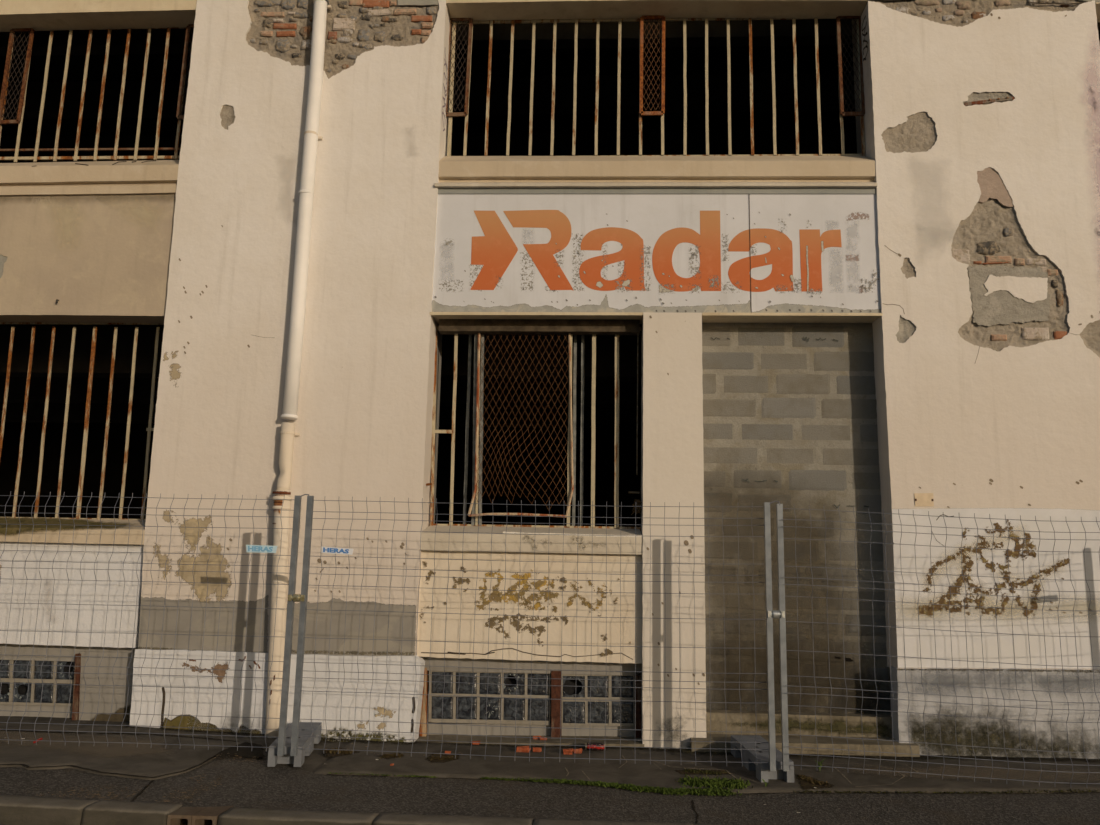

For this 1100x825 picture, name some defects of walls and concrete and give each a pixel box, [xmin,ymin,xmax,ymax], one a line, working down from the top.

spalling [246,0,314,66]
spalling [323,0,447,79]
spalling [220,105,235,130]
spalling [881,112,937,153]
spalling [963,92,1014,106]
spalling [951,167,1100,357]
spalling [896,316,916,343]
peeling [153,509,232,603]
peeling [453,566,618,646]
leakage [921,674,1099,692]
leakage [605,728,731,755]
leakage [789,712,1100,762]